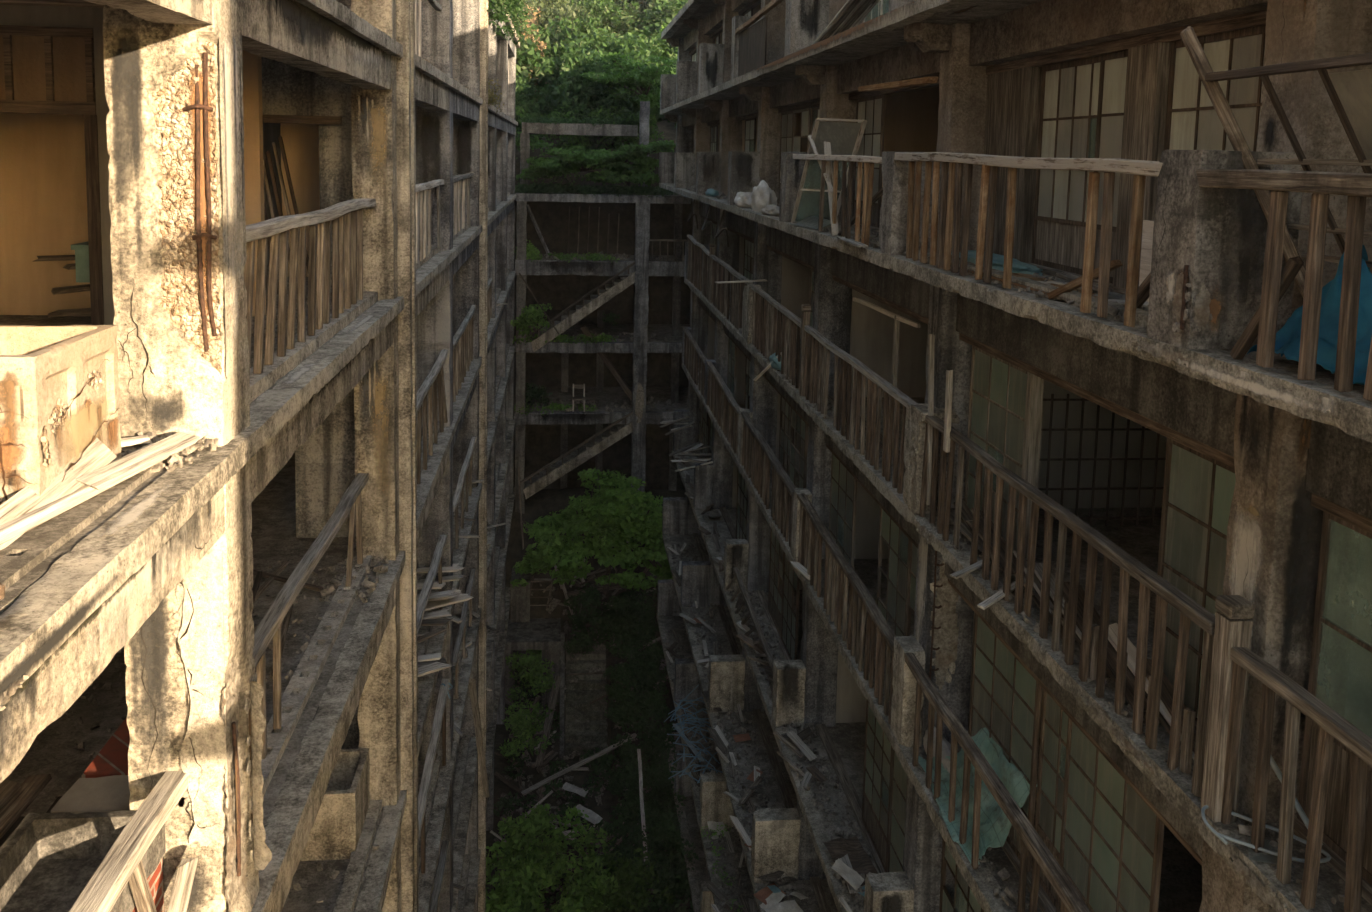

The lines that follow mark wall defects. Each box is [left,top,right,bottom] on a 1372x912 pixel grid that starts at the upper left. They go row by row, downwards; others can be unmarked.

leakage [801,0,818,37]
leakage [112,33,143,198]
rust [191,74,211,311]
crack [0,279,156,501]
leakage [143,393,183,431]